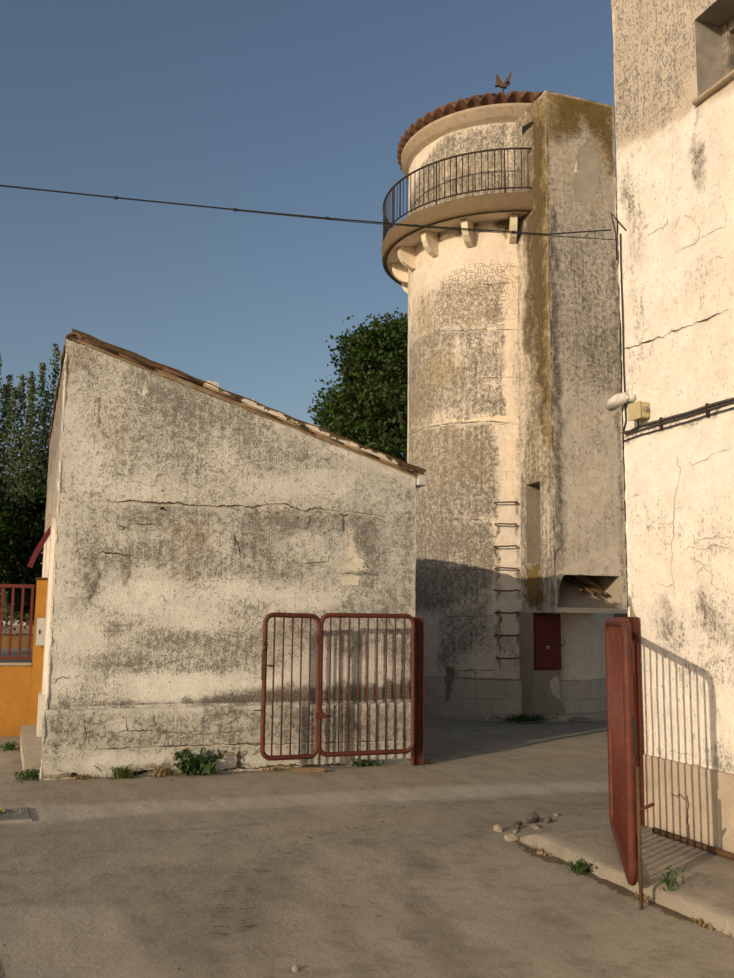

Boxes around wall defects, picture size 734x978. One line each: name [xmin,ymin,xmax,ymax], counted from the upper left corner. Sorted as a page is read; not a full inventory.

crack [624,310,725,349]
water stain [550,210,564,551]
crack [96,500,386,558]
crack [656,448,732,597]
crack [502,835,708,928]